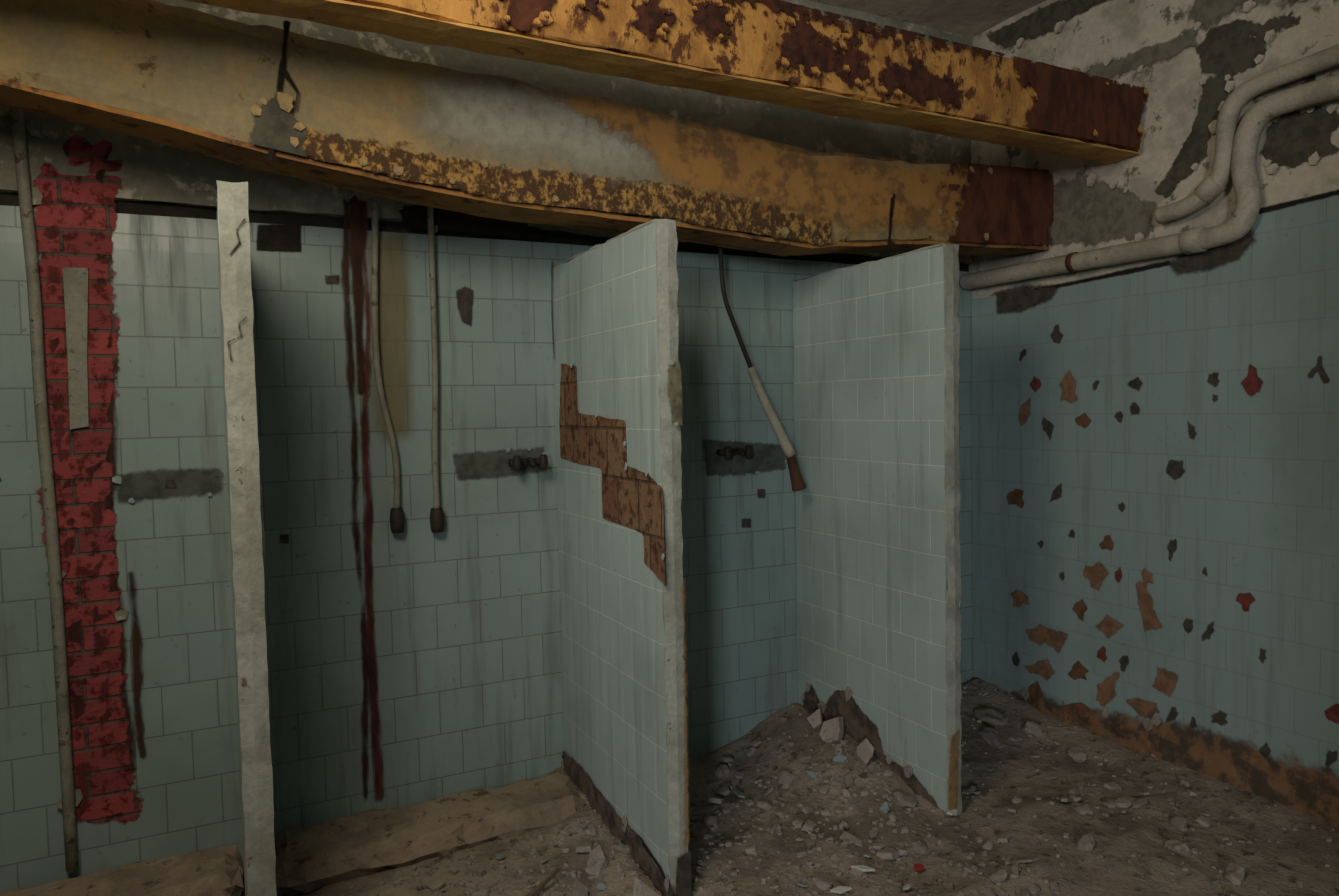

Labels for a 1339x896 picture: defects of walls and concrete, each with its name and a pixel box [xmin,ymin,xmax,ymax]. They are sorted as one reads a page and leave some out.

peeling [1260,103,1339,174]
peeling [1050,325,1063,343]
peeling [1018,377,1054,440]
peeling [1060,371,1091,428]
peeling [1115,377,1142,423]
peeling [1208,373,1219,402]
peeling [1241,364,1263,396]
peeling [453,361,665,586]
peeling [1007,489,1024,508]
peeling [1050,484,1062,502]
peeling [1166,460,1185,480]
spalling [1011,535,1339,830]